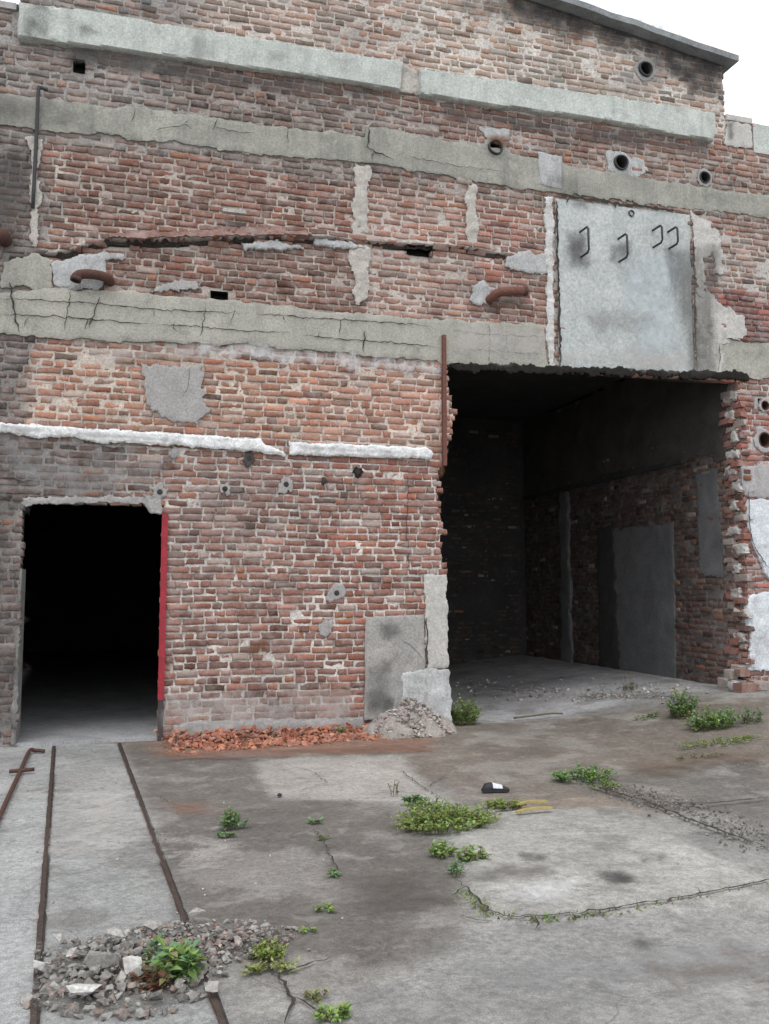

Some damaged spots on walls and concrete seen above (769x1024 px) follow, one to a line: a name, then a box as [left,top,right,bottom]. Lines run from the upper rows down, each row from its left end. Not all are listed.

crack [367,126,498,171]
crack [0,194,679,366]
spalling [718,390,769,680]
crack [451,877,769,929]
crack [252,947,334,1023]